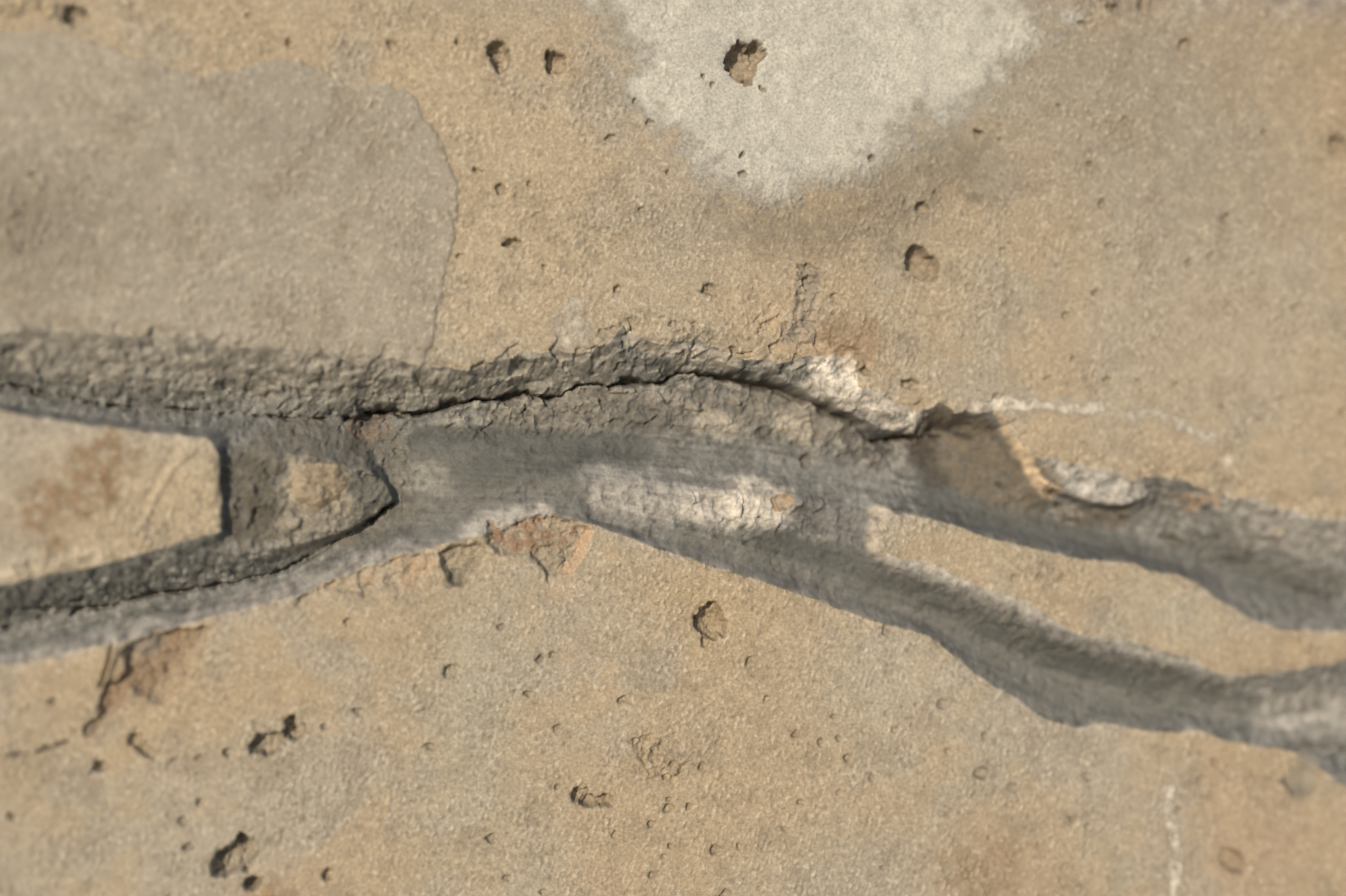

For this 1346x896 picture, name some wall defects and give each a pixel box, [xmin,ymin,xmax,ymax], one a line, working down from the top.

efflorescence [586,0,1041,206]
spalling [751,263,1053,510]
peeling [0,539,120,585]
spalling [214,433,399,556]
spalling [291,512,595,610]
crack [0,325,1346,785]
spalling [0,624,218,763]
spalling [629,730,693,787]